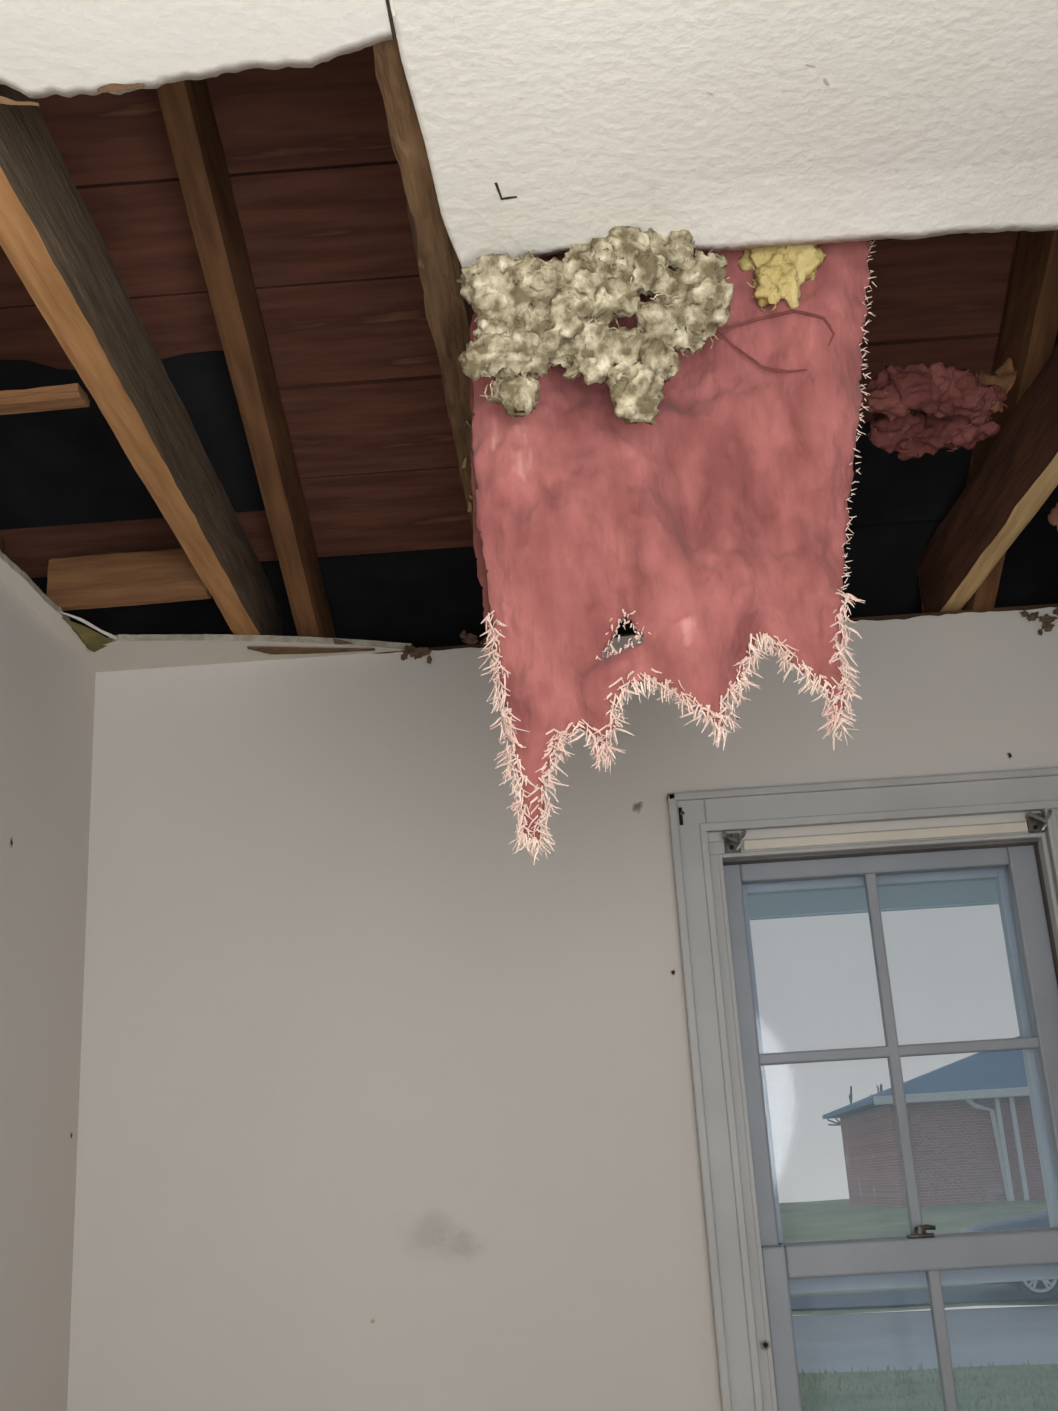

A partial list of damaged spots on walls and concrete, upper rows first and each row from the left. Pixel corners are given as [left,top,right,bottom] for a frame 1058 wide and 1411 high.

crack [386,0,396,38]
spalling [460,630,494,648]
spalling [400,645,432,664]